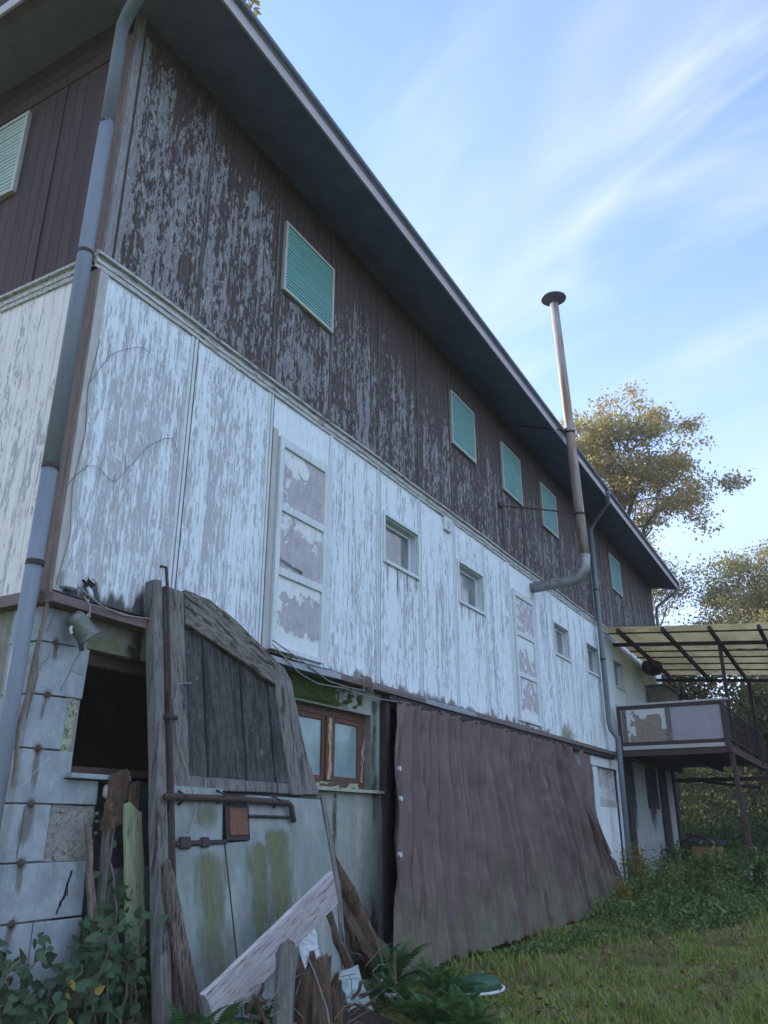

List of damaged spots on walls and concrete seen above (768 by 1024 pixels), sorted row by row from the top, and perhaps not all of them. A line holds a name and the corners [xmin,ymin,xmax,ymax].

peeling [114,37,649,747]
peeling [63,285,267,637]
damp [353,671,473,711]
peeling [626,708,668,742]
crack [56,870,73,915]
damp [200,855,224,971]
damp [249,831,291,938]